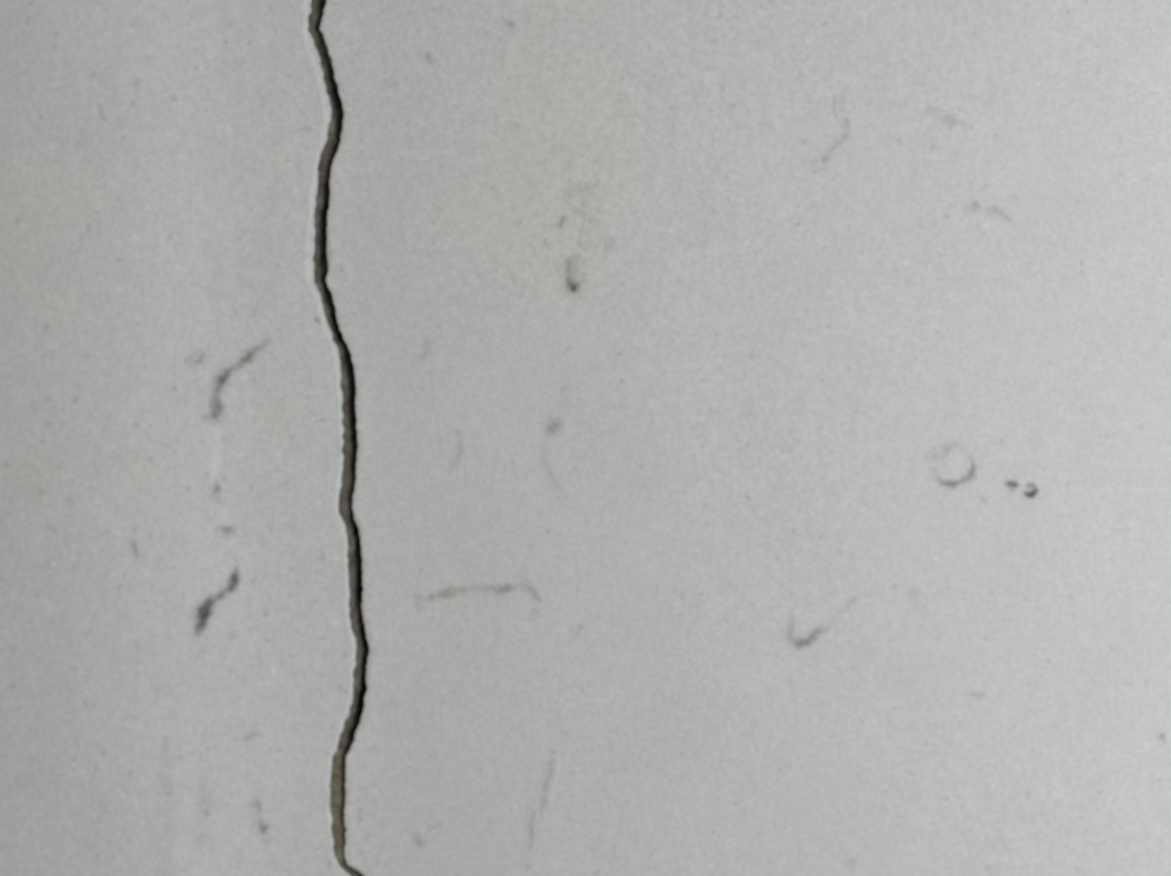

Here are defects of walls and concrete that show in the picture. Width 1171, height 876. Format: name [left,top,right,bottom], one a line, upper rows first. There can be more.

crack [302,0,370,876]